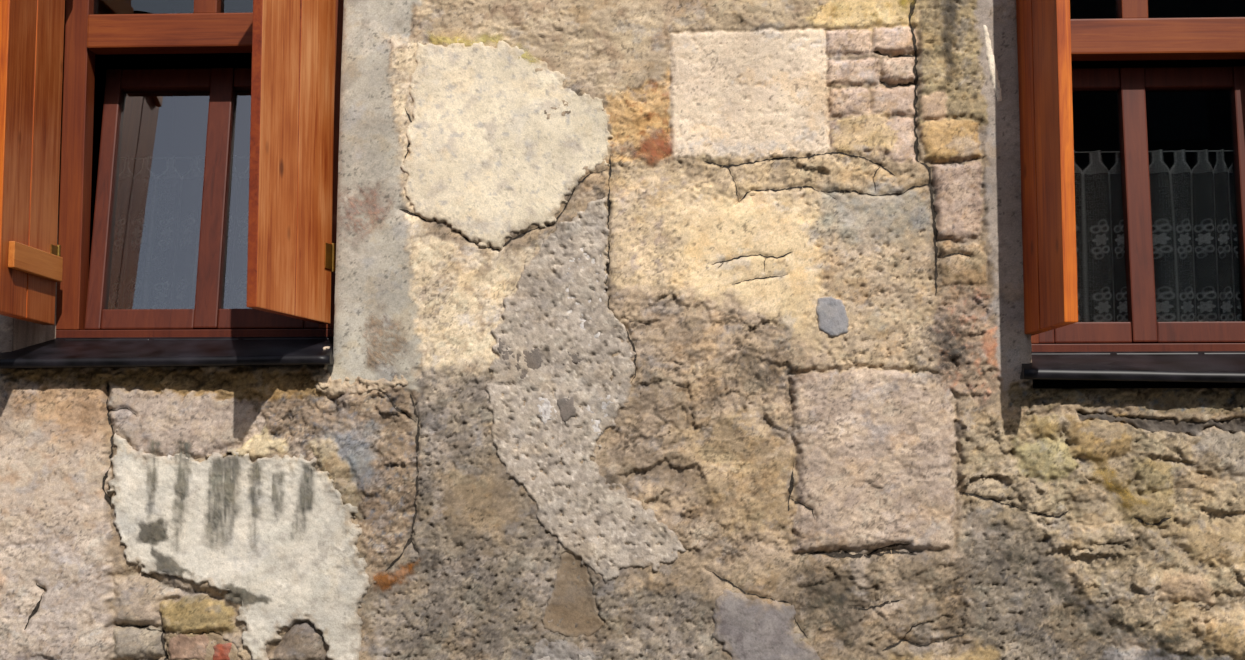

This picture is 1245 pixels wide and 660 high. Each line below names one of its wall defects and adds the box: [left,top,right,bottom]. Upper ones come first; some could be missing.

crack [704,0,971,294]
crack [400,154,637,382]
crack [102,383,137,506]
peeling [107,429,376,660]
crack [386,394,420,571]